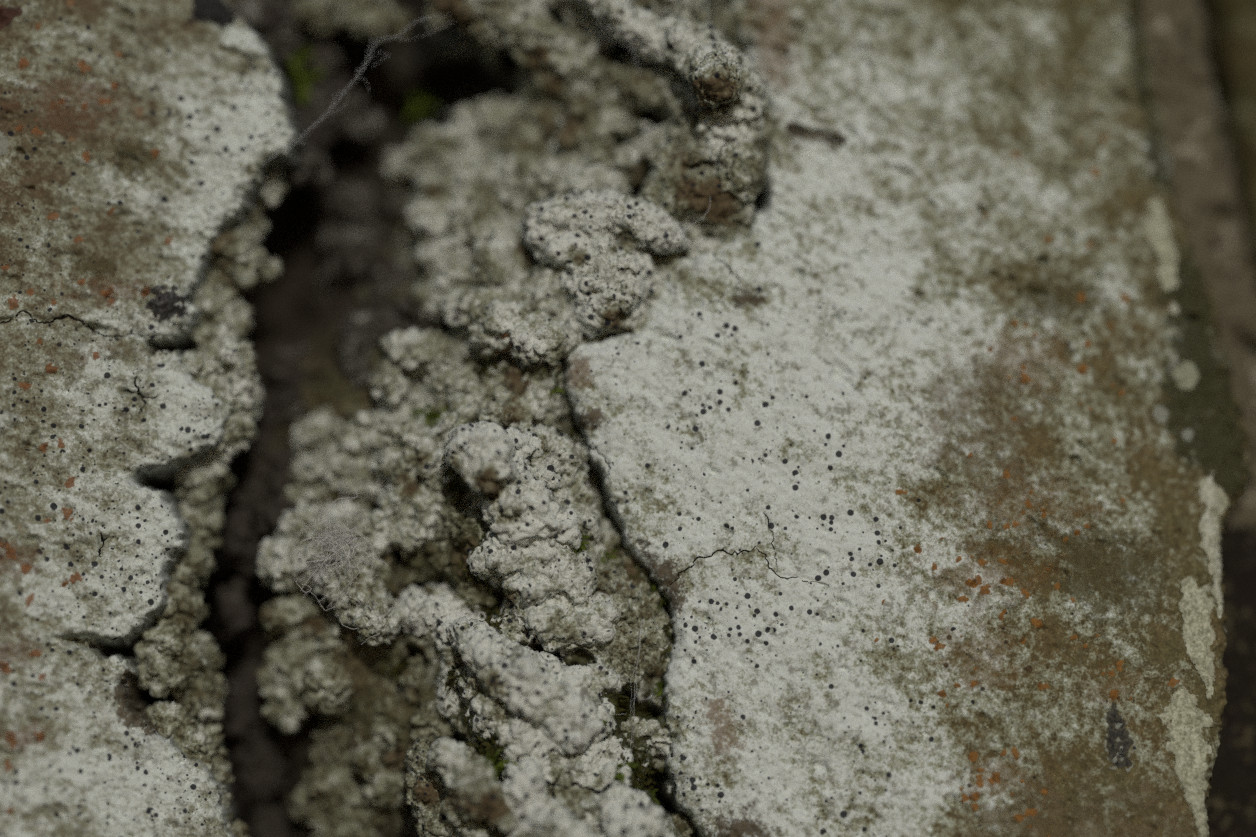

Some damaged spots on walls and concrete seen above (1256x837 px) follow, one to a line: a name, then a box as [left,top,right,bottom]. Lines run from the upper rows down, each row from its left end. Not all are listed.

crack [0,310,158,342]
crack [121,376,158,412]
water stain [575,408,604,431]
water stain [628,533,688,614]
peeling [1156,471,1229,837]
water stain [700,698,743,763]
water stain [704,801,781,837]